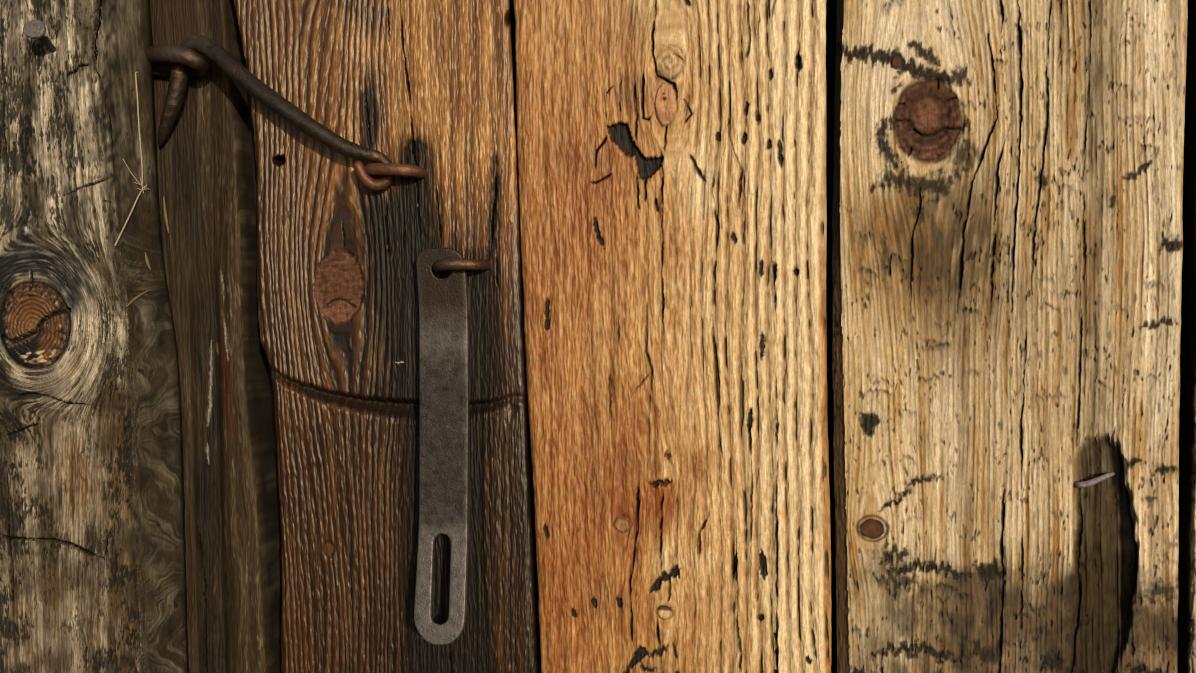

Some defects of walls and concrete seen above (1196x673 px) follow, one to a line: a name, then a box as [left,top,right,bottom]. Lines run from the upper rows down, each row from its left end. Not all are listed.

crack [746,0,774,56]
crack [51,0,114,202]
crack [959,0,1092,300]
crack [593,0,743,442]
crack [1018,404,1026,461]
crack [1075,321,1083,434]
crack [1,482,112,600]